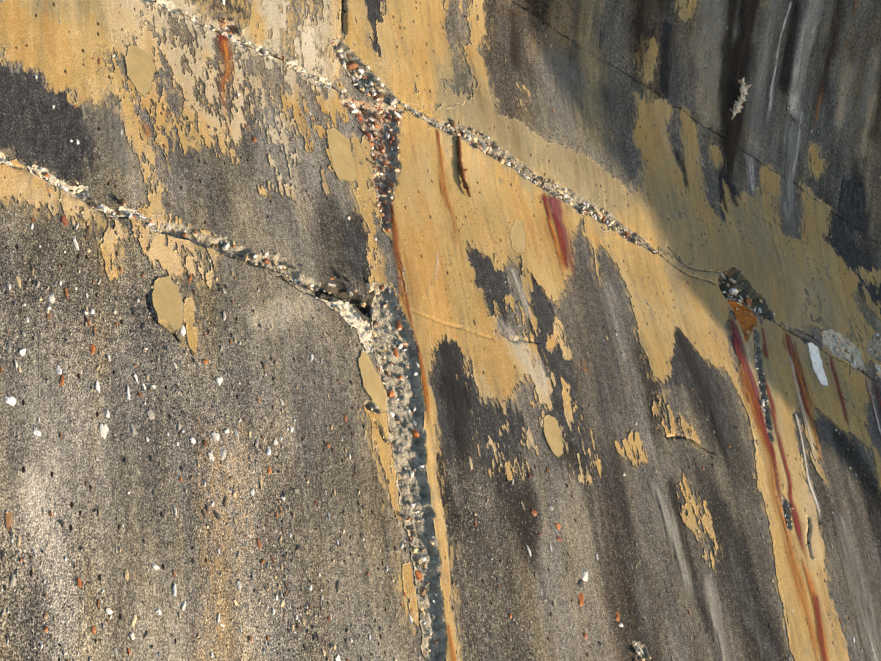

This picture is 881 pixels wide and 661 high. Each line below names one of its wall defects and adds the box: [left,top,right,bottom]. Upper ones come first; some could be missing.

corrosion [219,35,231,102]
crack [511,0,722,137]
corrosion [437,132,456,230]
corrosion [542,194,574,266]
crack [146,295,179,341]
crack [269,273,328,300]
peeling [614,422,664,477]
damp [661,327,738,460]
damp [790,357,820,511]
peeling [244,358,384,661]
damp [651,483,691,590]
peeling [675,473,719,572]